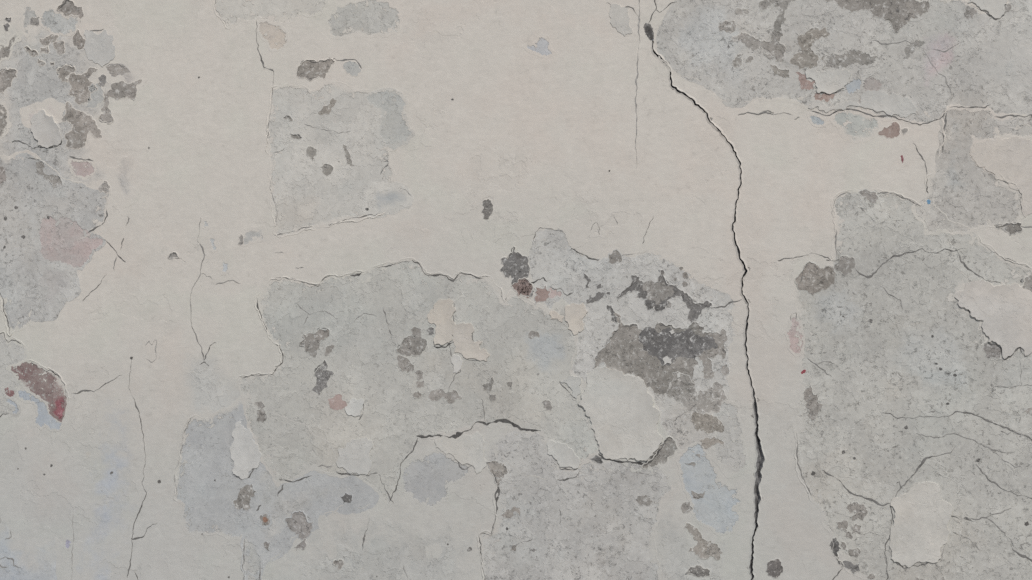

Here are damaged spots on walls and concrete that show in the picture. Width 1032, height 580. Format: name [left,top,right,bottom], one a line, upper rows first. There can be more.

peeling [0,0,143,223]
peeling [237,58,415,247]
peeling [326,0,403,40]
peeling [0,331,29,420]
crack [75,340,157,579]
crack [190,221,237,366]
peeling [173,225,737,580]
crack [380,400,539,503]
crack [609,0,1032,580]
peeling [718,0,1032,580]